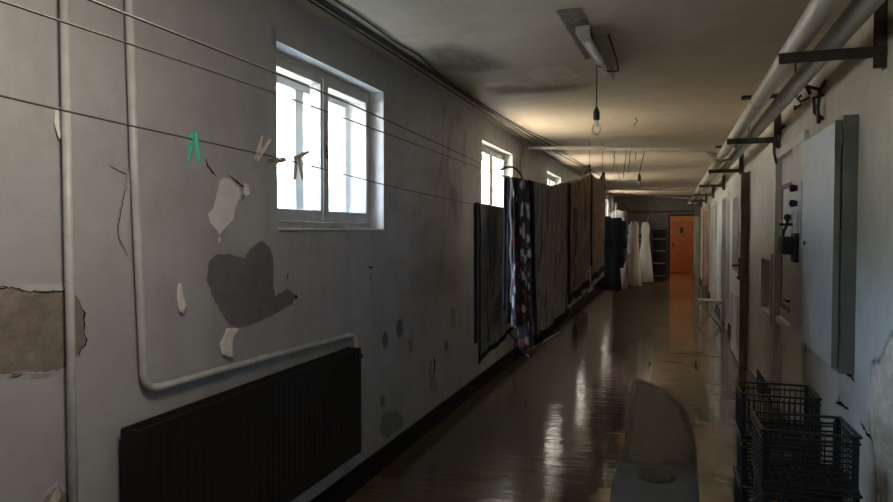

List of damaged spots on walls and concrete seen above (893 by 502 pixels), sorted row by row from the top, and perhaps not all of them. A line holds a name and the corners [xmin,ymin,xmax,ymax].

flaking render [0,281,89,381]
peeling [205,158,298,358]
peeling [868,337,893,502]